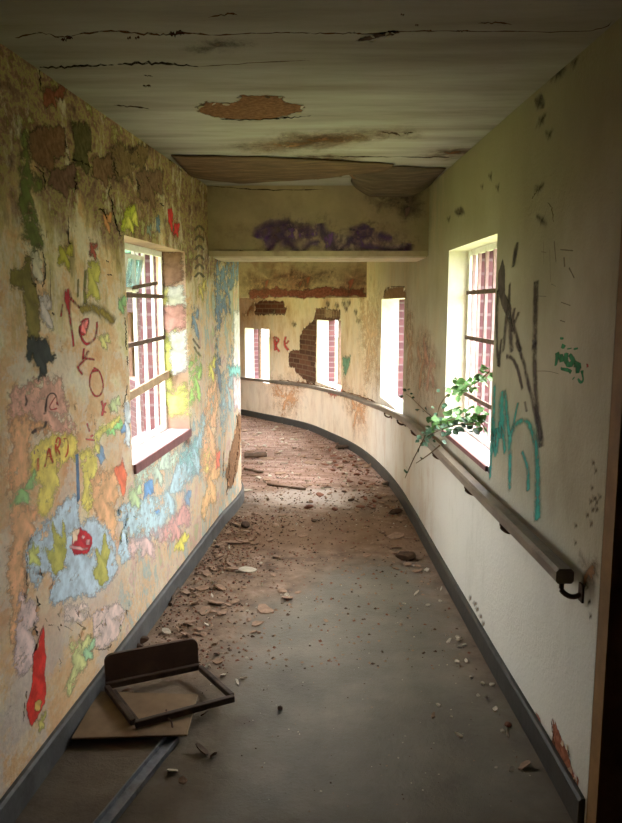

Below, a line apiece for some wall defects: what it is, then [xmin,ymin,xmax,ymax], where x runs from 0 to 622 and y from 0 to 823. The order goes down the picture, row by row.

crack [16,12,610,41]
peeling [38,70,67,110]
crack [40,60,305,87]
peeling [196,95,311,121]
peeling [27,121,165,210]
peeling [31,250,45,286]
flaking render [243,278,367,387]
peeling [223,413,242,495]
peeling [24,537,107,657]
flaking render [550,719,579,785]